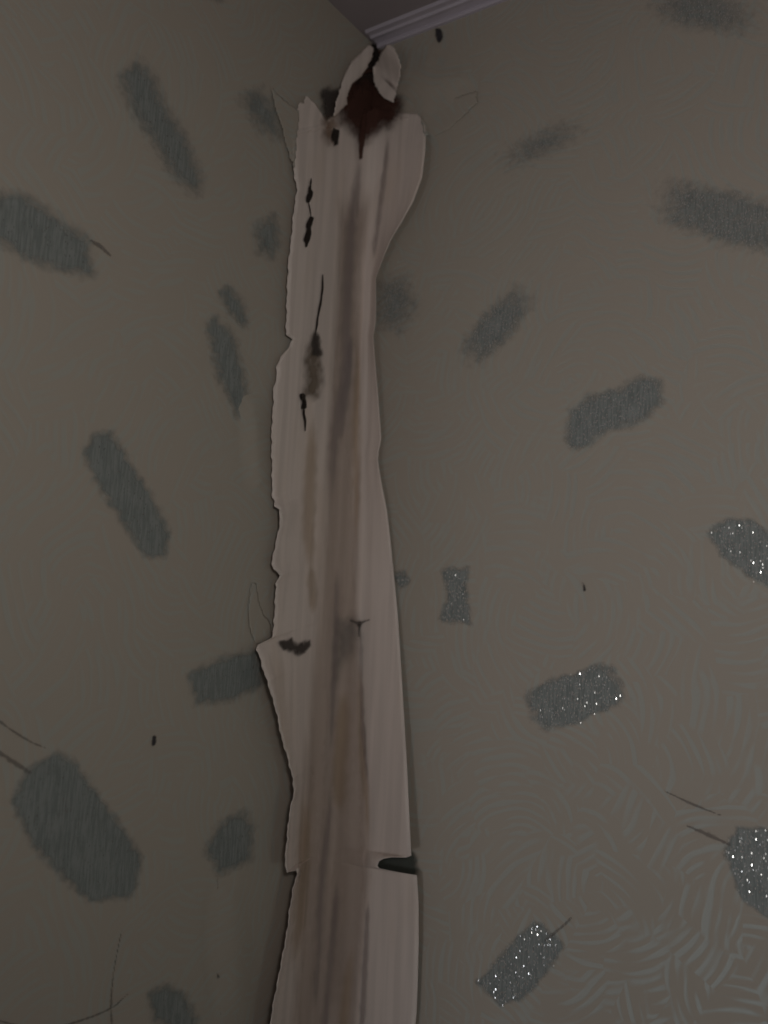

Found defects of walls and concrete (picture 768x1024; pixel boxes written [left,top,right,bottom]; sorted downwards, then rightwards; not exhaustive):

peeling [271,43,401,167]